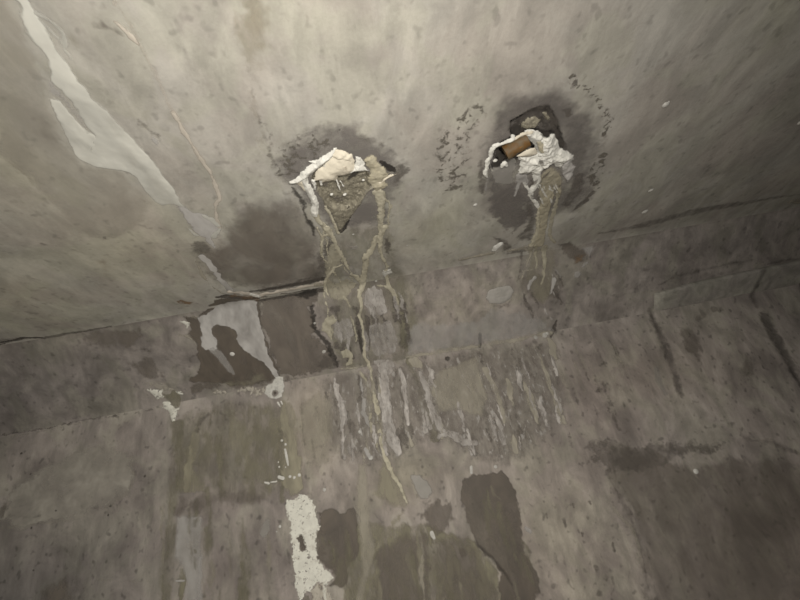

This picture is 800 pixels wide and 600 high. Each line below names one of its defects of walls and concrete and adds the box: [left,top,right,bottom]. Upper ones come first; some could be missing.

damp [459,94,607,297]
crack [0,337,42,345]
damp [17,0,483,505]
crack [215,277,325,301]
damp [175,510,212,600]
peeling [285,494,334,600]
damp [317,466,540,600]